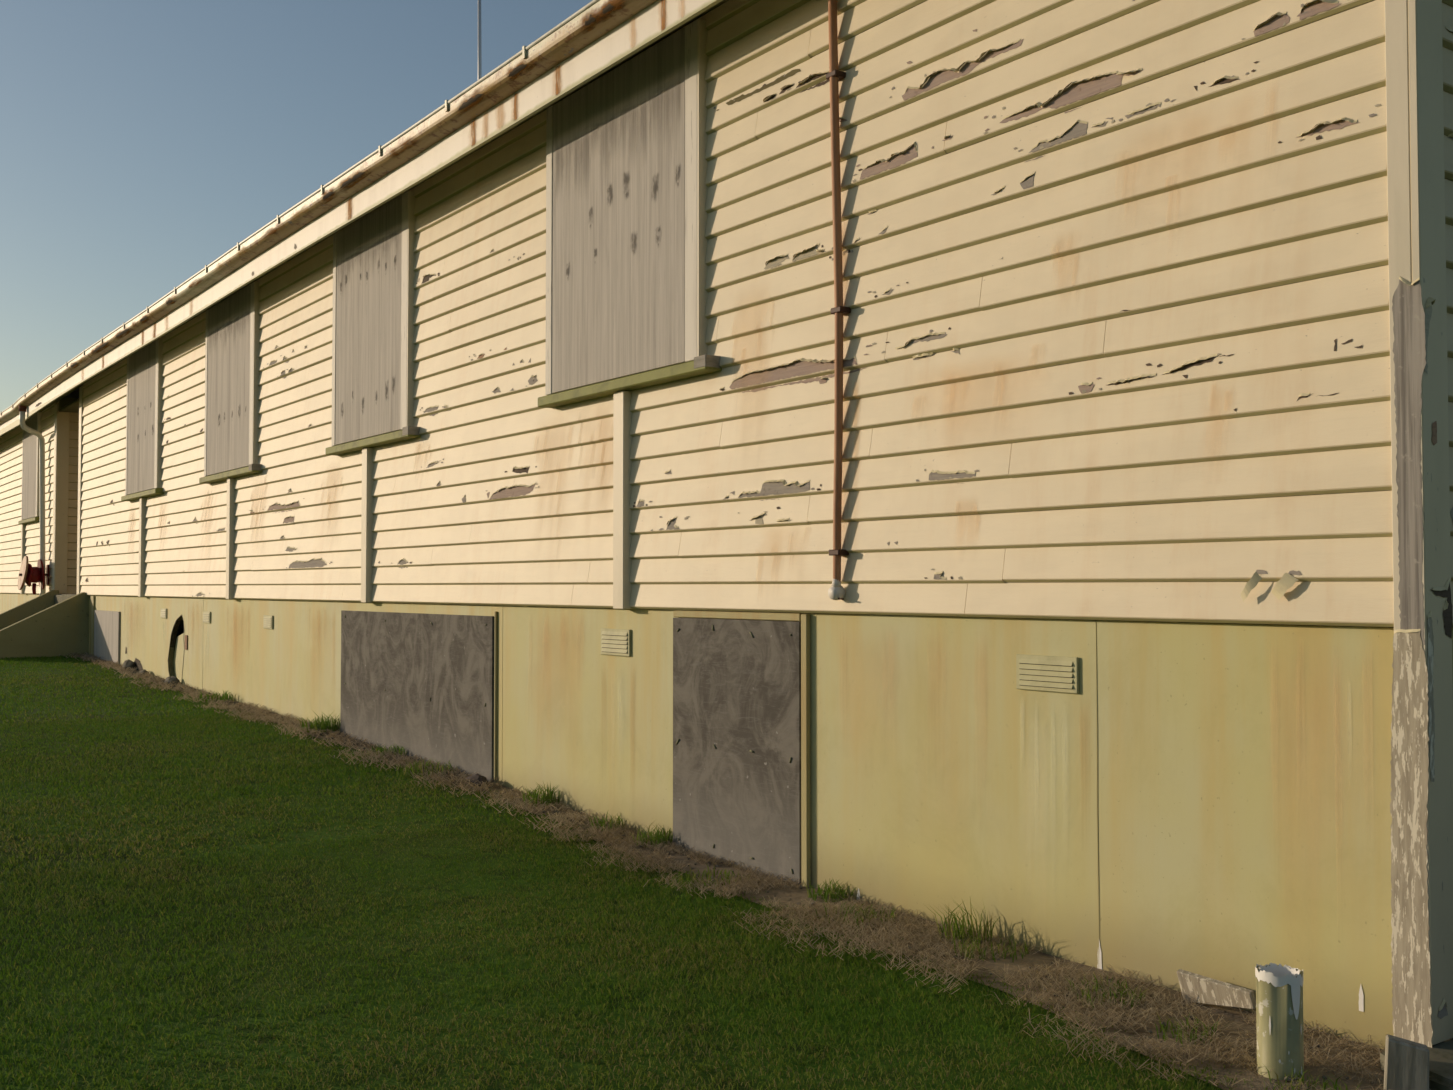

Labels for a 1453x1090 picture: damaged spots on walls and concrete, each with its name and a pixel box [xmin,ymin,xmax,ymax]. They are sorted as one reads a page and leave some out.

corrosion [582,0,624,32]
corrosion [462,87,491,146]
corrosion [507,61,534,120]
peeling [853,135,953,182]
peeling [889,39,1023,100]
peeling [984,68,1175,195]
peeling [1194,61,1259,91]
peeling [719,327,960,393]
peeling [250,488,332,568]
peeling [486,466,539,500]
peeling [724,479,821,524]
peeling [1392,276,1437,782]